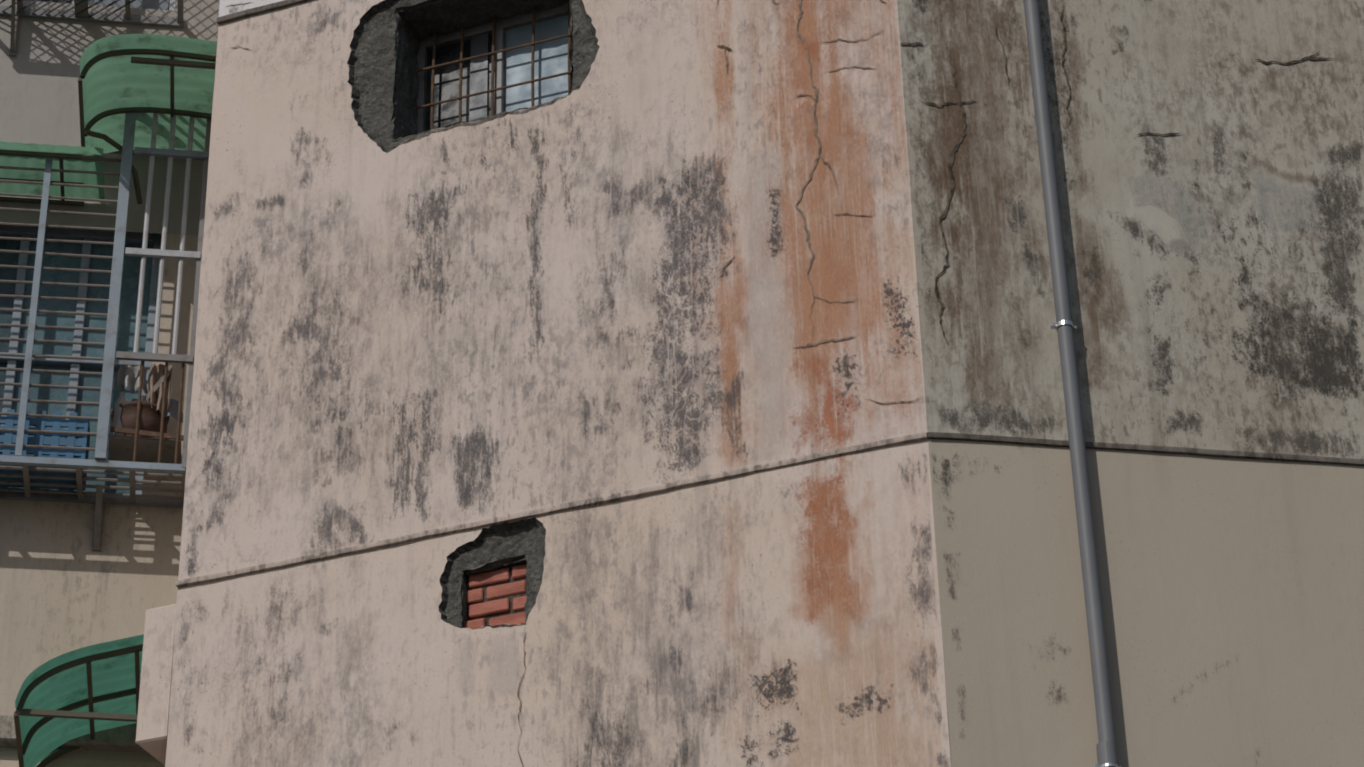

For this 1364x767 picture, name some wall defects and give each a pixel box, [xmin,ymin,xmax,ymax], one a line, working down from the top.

spalling [347,0,600,153]
damp [527,131,546,355]
mould [604,156,745,471]
rust [793,232,854,442]
crack [772,0,925,348]
crack [921,63,976,343]
crack [1060,4,1071,132]
crack [1255,51,1342,65]
mould [1233,146,1364,396]
spalling [438,517,546,630]
rust [799,475,859,642]
mould [739,659,799,766]